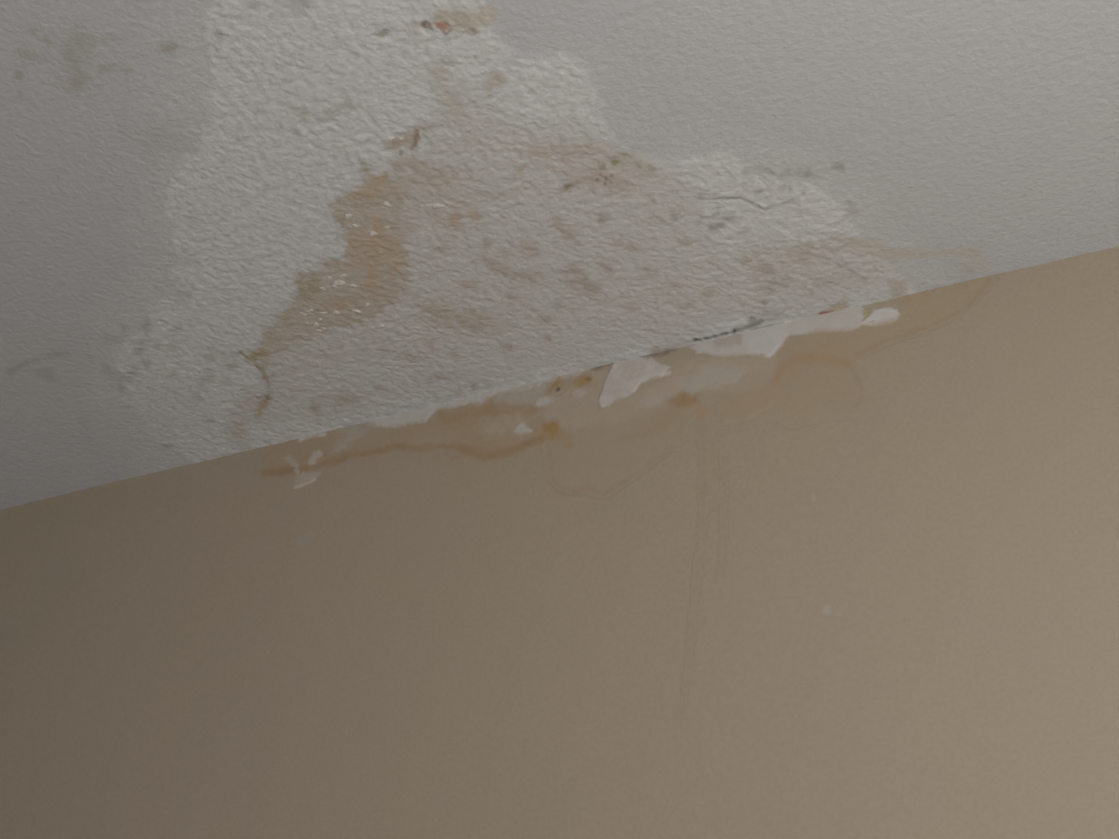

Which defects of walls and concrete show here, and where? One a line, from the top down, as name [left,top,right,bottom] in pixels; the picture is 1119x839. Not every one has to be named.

flaking render [72,0,961,481]
damp [242,62,1005,480]